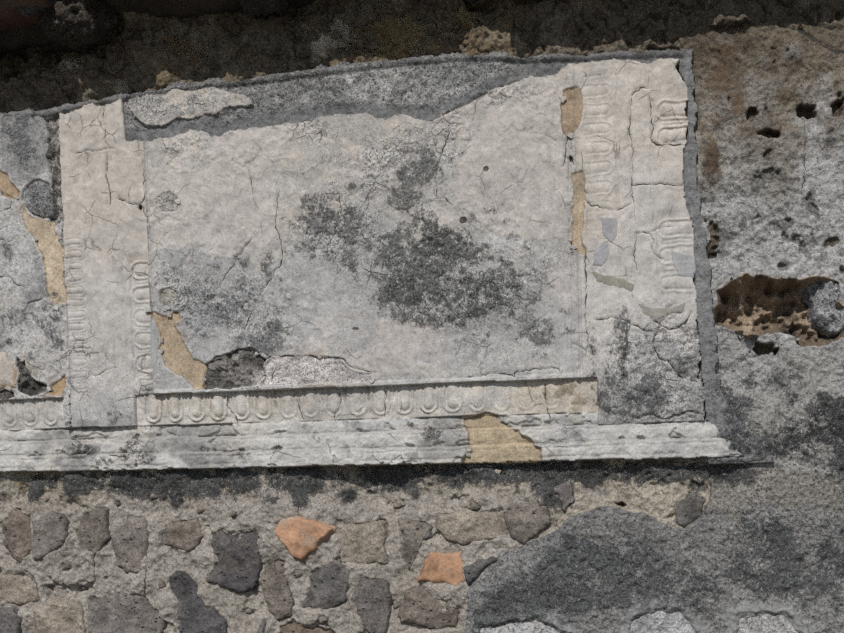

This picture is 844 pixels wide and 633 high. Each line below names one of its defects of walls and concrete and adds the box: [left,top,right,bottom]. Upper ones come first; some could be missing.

crack [105,173,148,221]
crack [433,84,510,204]
flaking render [559,87,583,139]
crack [586,87,684,268]
leakage [285,146,576,356]
spalling [0,357,66,400]
spalling [144,288,374,390]
crack [209,349,370,382]
crack [577,252,695,381]
spalling [713,272,844,347]
leakage [0,362,844,524]
flaking render [462,412,542,474]